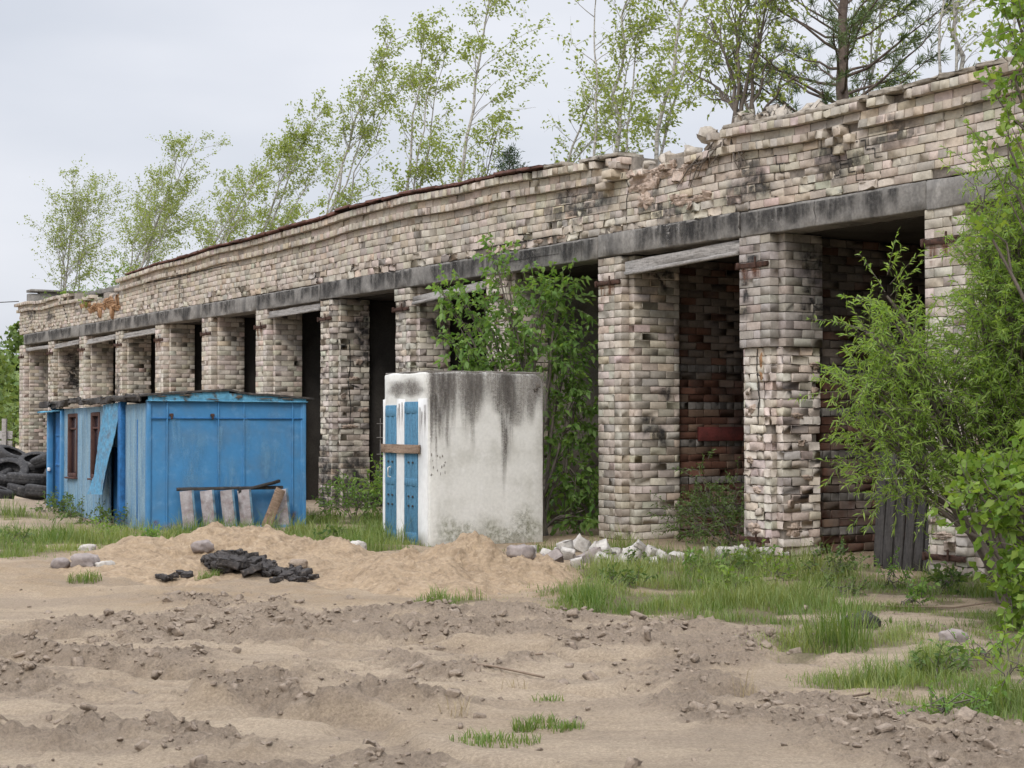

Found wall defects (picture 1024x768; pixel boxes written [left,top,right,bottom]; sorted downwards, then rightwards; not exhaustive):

spalling [625,159,712,211]
damp [639,162,896,244]
damp [392,371,545,462]